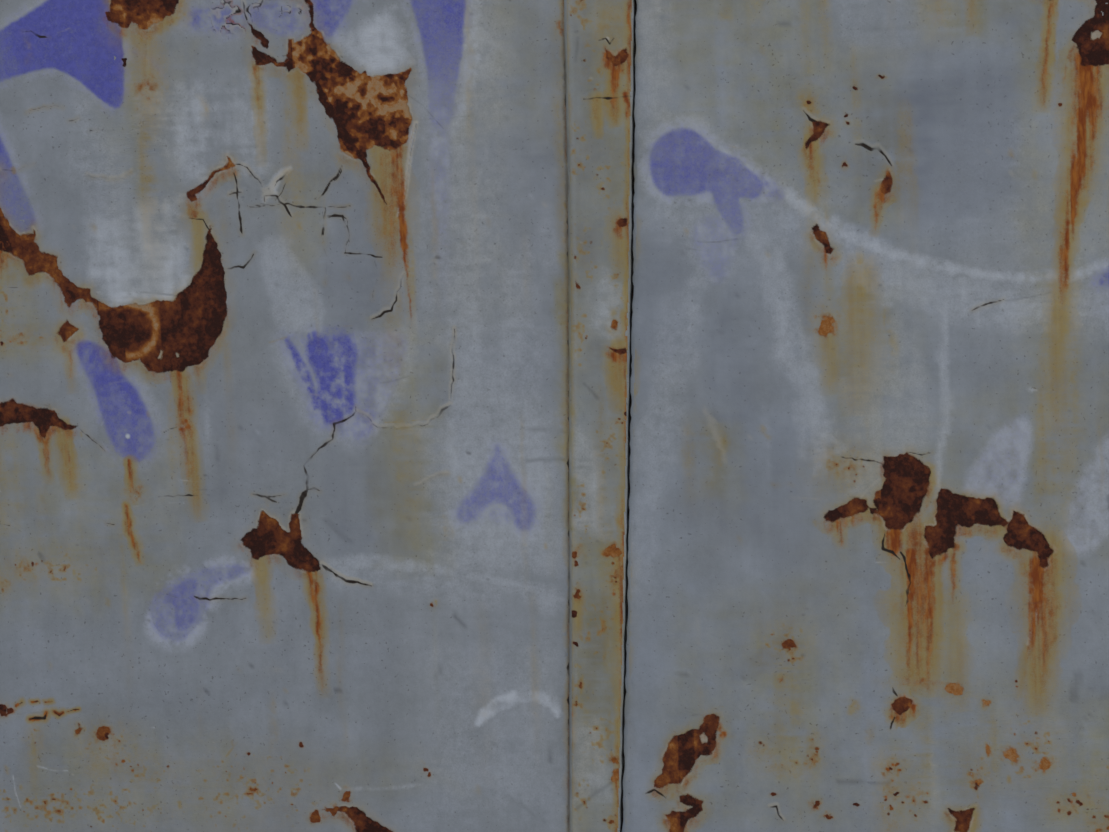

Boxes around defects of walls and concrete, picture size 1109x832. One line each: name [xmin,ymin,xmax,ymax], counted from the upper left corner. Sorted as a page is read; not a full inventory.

rust [0,0,424,568]
crack [223,158,410,325]
rust [1025,0,1109,440]
crack [246,400,362,520]
rust [548,0,737,832]
rust [795,211,1084,736]
rust [0,689,85,730]
rust [934,795,986,832]
rust [1031,742,1109,832]